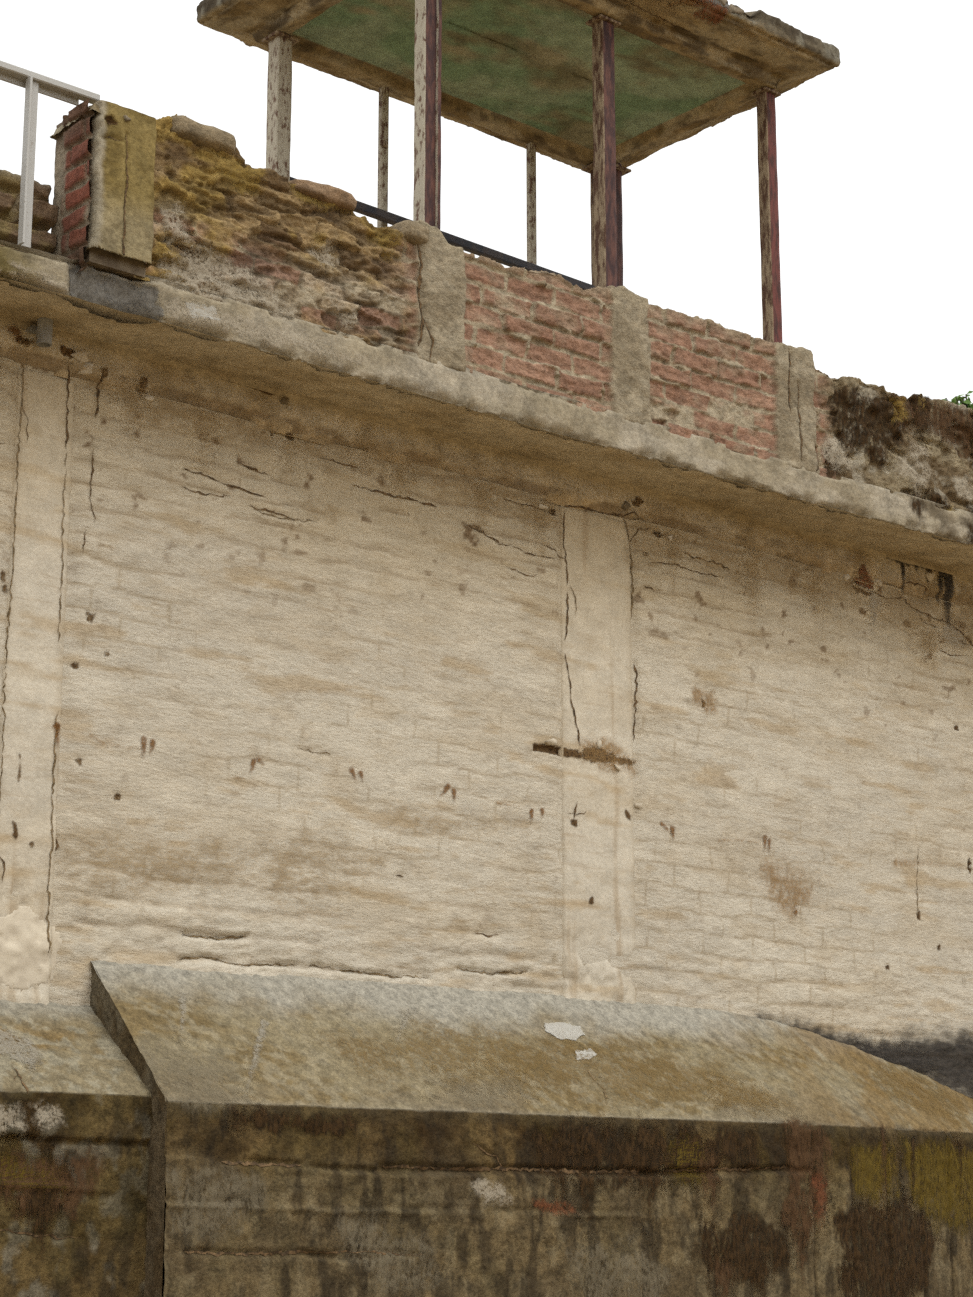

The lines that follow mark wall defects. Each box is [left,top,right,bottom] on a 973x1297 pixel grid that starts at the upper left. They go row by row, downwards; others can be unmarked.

crack [0,347,29,799]
crack [58,366,104,642]
crack [320,457,437,507]
crack [468,499,730,747]
leakage [821,386,973,544]
crack [869,581,973,656]
crack [46,711,59,953]
leakage [0,1106,61,1132]
leakage [759,1015,973,1099]
leakage [0,1150,100,1252]
leakage [697,1213,789,1297]
leakage [833,1139,937,1297]